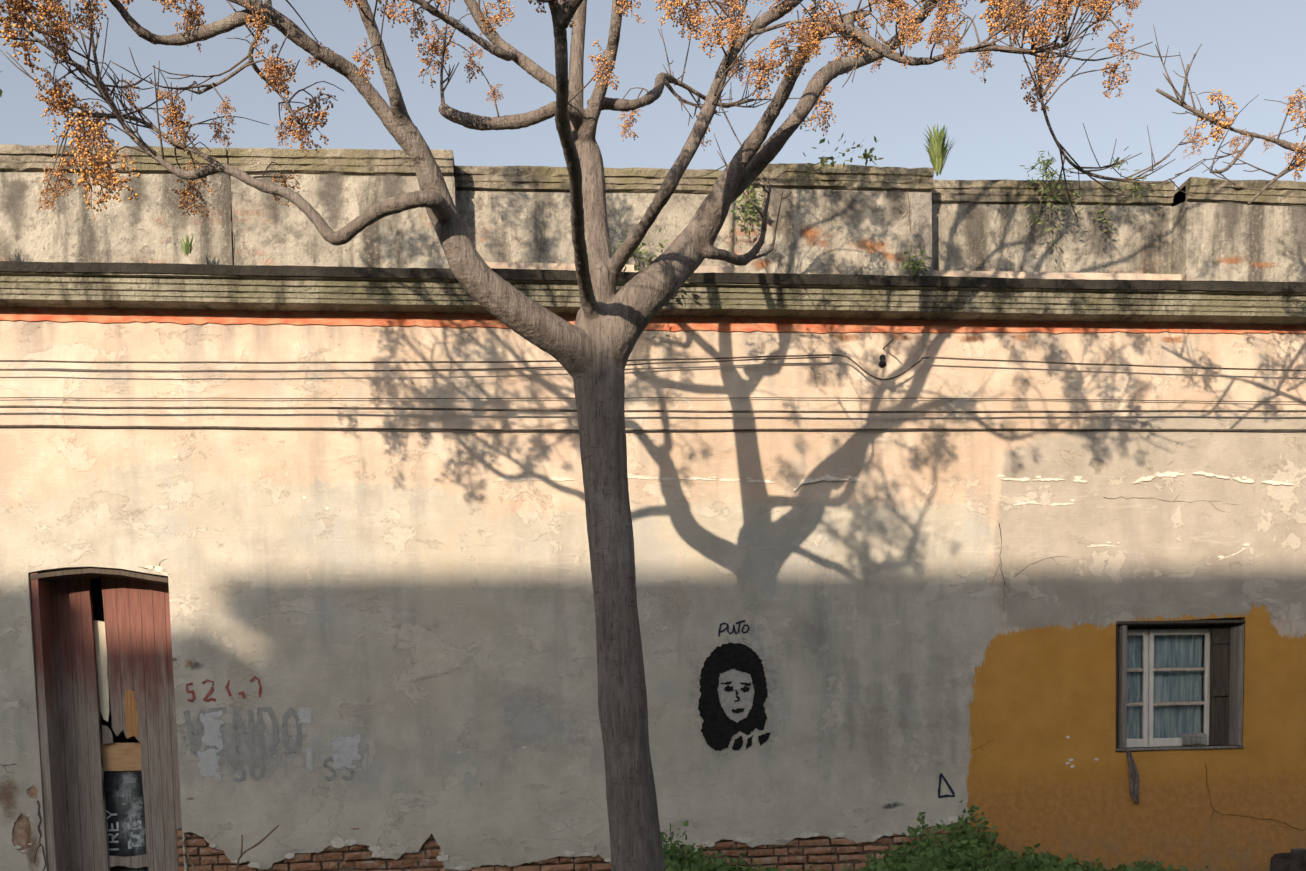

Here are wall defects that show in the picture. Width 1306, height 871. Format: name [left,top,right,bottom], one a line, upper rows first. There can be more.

water stain [8,182,22,229]
water stain [321,173,341,219]
water stain [1024,204,1045,244]
water stain [1222,201,1238,228]
flaking render [12,814,32,852]
flaking render [177,828,611,871]
flaking render [686,816,971,871]